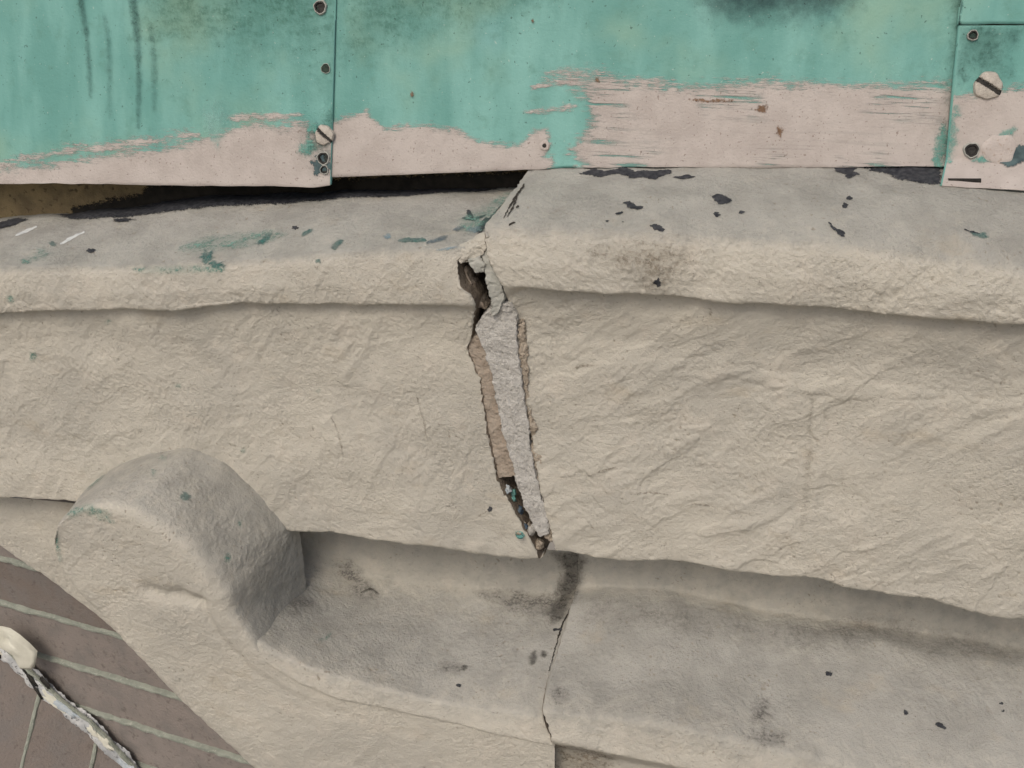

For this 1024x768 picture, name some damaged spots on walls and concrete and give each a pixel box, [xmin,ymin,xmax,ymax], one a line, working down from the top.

crack [458,184,524,310]
crack [517,319,543,481]
crack [544,521,552,542]
crack [548,610,569,671]